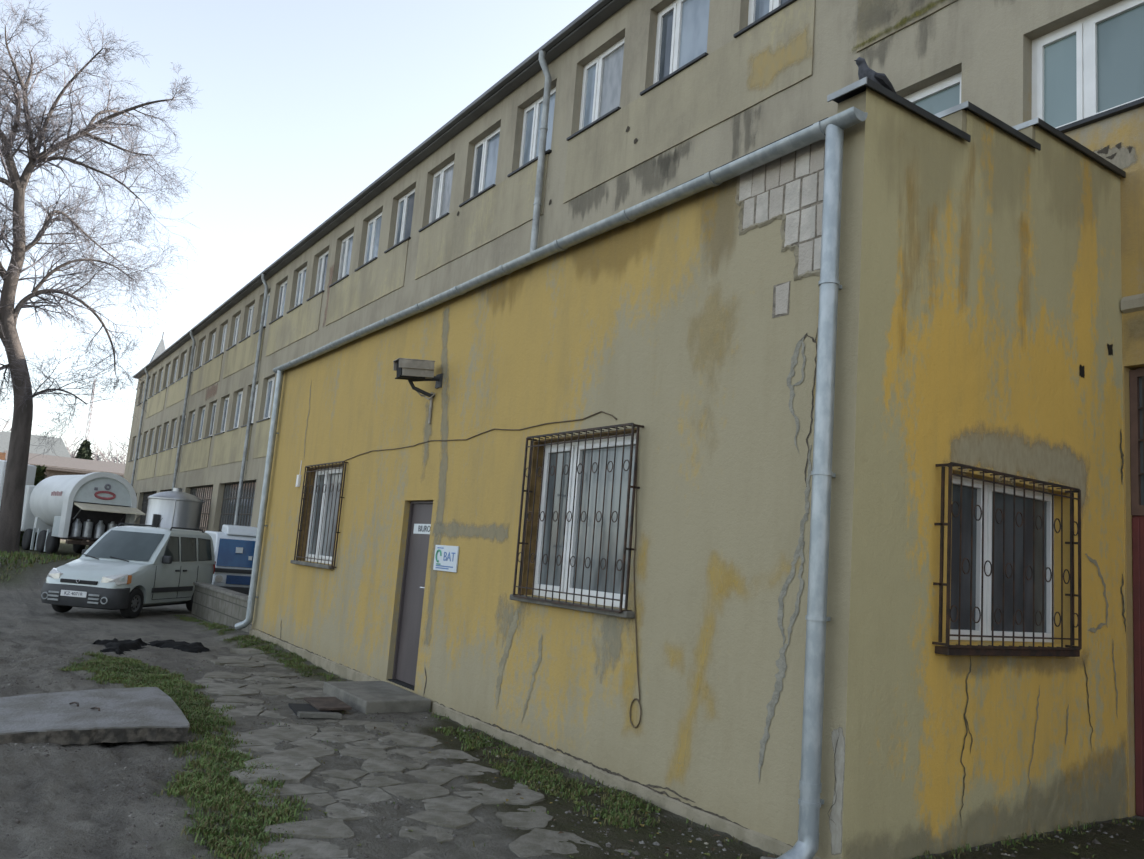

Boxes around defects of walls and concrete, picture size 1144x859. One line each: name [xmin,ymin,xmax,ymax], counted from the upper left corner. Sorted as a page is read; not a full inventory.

spalling [735,139,825,318]
spalling [1094,142,1137,169]
crack [758,328,818,784]
crack [256,619,381,681]
crack [423,609,748,829]
crack [960,658,973,824]